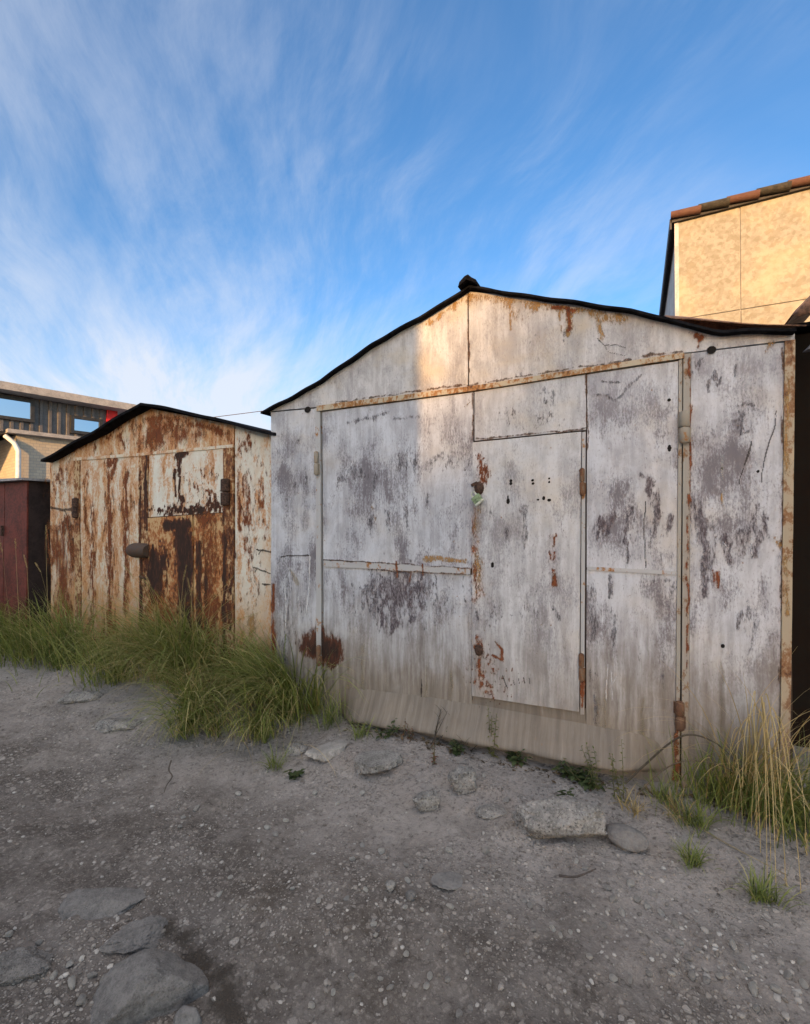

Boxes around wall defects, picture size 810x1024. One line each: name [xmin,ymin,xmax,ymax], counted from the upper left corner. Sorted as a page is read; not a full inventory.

corrosion [339,294,704,449]
corrosion [768,342,789,484]
corrosion [45,412,276,671]
peeling [351,560,448,635]
corrosion [477,453,491,485]
corrosion [548,533,558,587]
peeling [594,506,636,564]
peeling [640,472,674,535]
peeling [690,501,769,598]
corrosion [774,500,790,615]
corrosion [295,625,344,671]
corrosion [470,634,525,704]